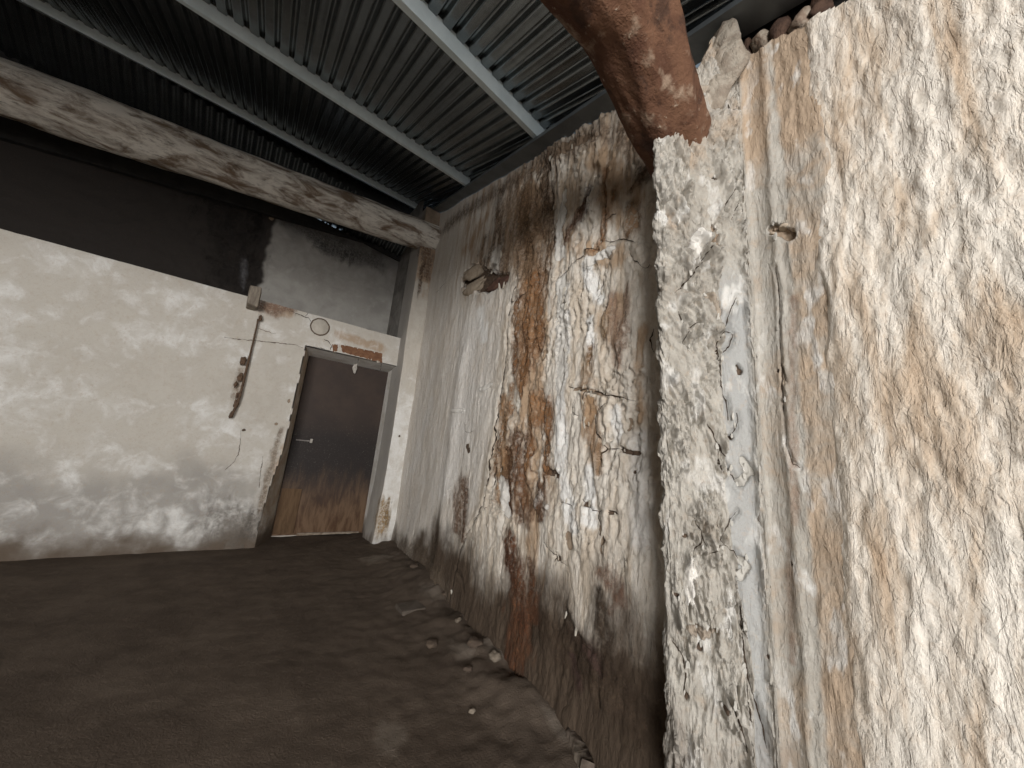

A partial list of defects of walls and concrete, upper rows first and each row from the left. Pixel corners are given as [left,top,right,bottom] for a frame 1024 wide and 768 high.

spalling [769,222,796,241]
spalling [462,245,510,296]
spalling [703,289,721,320]
crack [225,311,332,349]
crack [540,177,650,541]
corrosion [493,182,591,673]
corrosion [378,498,390,535]
spalling [686,622,719,651]
water stain [539,568,662,752]